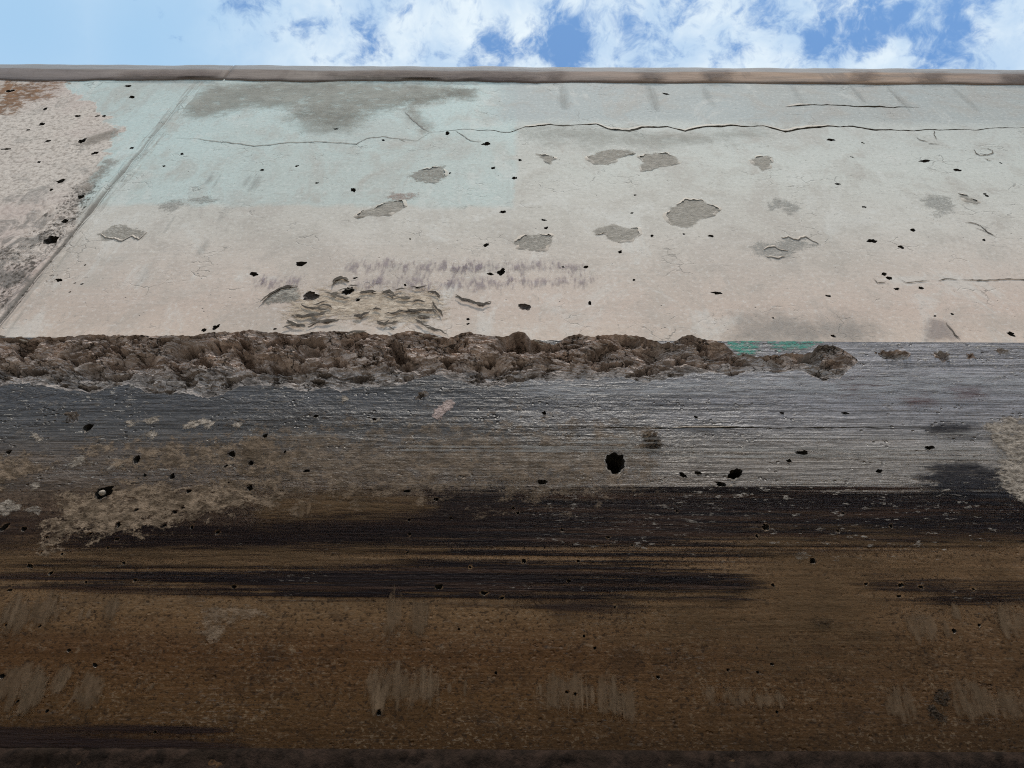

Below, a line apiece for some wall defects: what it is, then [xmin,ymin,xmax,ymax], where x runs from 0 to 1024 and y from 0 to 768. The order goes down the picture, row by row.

crack [196,103,1024,160]
peeling [584,149,681,172]
peeling [409,165,449,184]
peeling [353,192,414,219]
peeling [662,198,722,227]
peeling [98,224,147,242]
peeling [514,233,554,252]
peeling [593,224,643,243]
peeling [753,235,817,258]
spalling [0,329,858,403]
damp [0,437,1024,651]